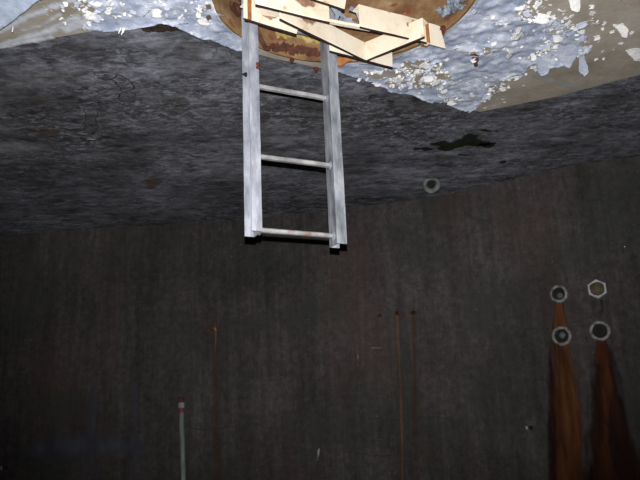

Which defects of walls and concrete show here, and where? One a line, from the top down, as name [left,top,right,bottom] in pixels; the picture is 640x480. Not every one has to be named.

corrosion [229,0,241,17]
peeling [0,0,242,52]
corrosion [270,41,321,57]
peeling [338,0,640,113]
crack [88,75,164,108]
damp [414,129,498,155]
corrosion [548,337,640,480]